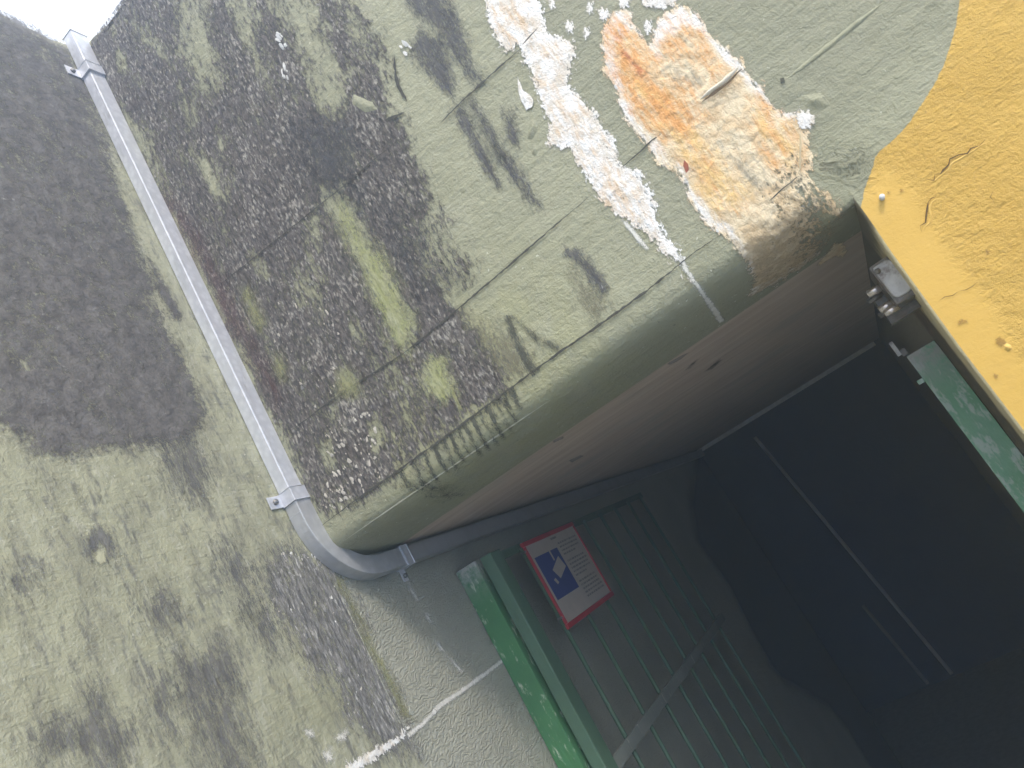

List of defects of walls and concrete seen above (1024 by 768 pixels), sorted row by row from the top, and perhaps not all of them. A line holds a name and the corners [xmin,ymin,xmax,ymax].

damp [0,10,222,510]
damp [91,0,559,518]
damp [406,0,724,323]
corrosion [600,2,847,298]
crack [920,140,987,231]